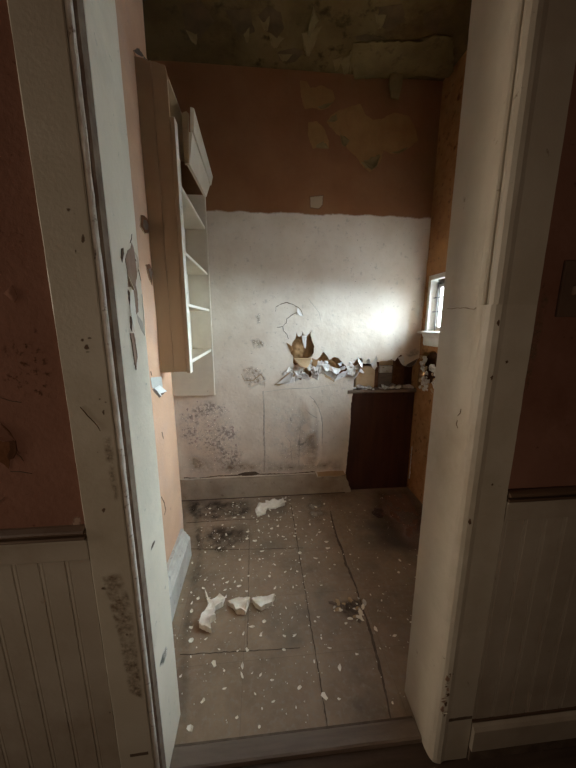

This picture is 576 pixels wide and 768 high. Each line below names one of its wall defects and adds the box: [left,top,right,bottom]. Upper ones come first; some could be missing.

peeling [121,235,153,369]
crack [275,298,321,339]
spalling [286,333,323,374]
crack [330,510,392,721]